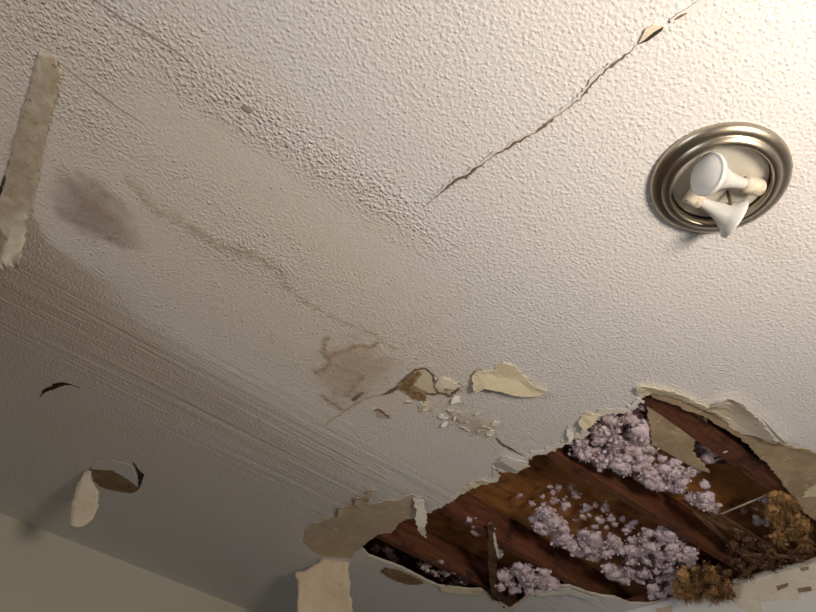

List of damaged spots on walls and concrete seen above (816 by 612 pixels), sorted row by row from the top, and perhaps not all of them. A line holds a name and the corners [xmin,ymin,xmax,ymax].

crack [424,0,710,207]
crack [39,382,80,398]
peeling [567,412,602,442]
peeling [90,460,138,487]
peeling [459,480,492,494]
peeling [492,455,527,474]
peeling [413,496,427,538]
peeling [439,585,482,596]
spalling [732,563,816,612]